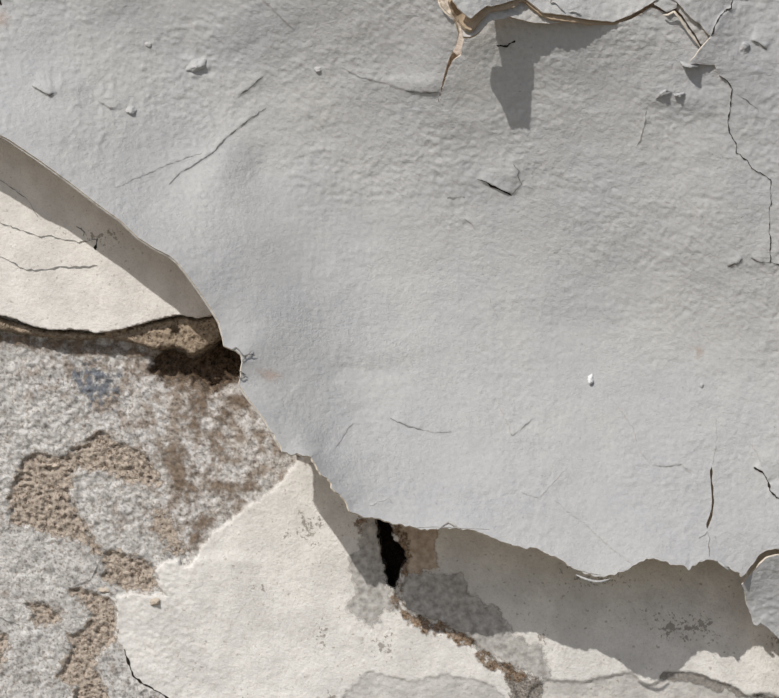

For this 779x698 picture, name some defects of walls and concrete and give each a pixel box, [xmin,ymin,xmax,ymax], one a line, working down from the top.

peeling [448,0,656,39]
crack [115,108,266,187]
peeling [674,0,779,265]
crack [722,77,779,267]
crack [2,257,97,271]
flaking render [0,316,222,355]
damp [63,359,122,411]
damp [162,443,198,503]
damp [211,481,261,500]
crack [749,441,779,499]
flaking render [6,430,165,698]
damp [346,517,551,678]